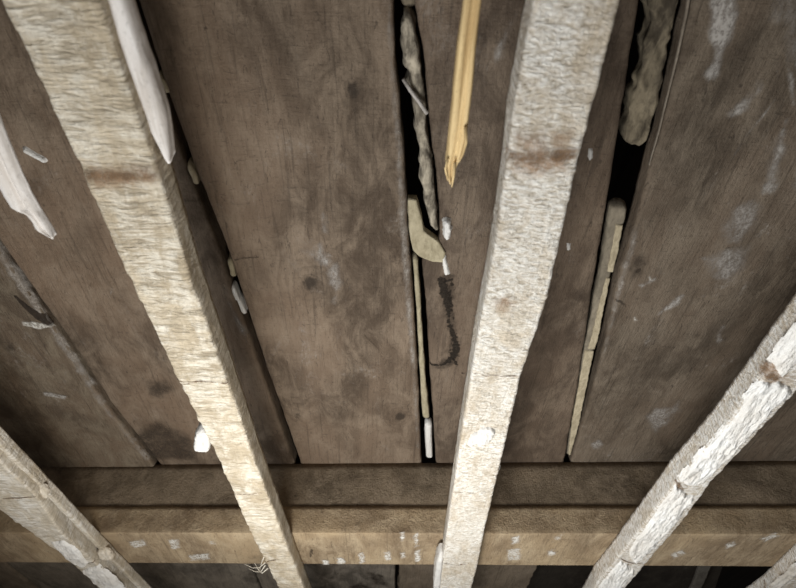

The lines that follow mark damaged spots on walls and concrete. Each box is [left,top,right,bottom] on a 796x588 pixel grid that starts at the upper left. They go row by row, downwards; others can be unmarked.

rust [509,150,575,170]
peeling [598,323,796,588]